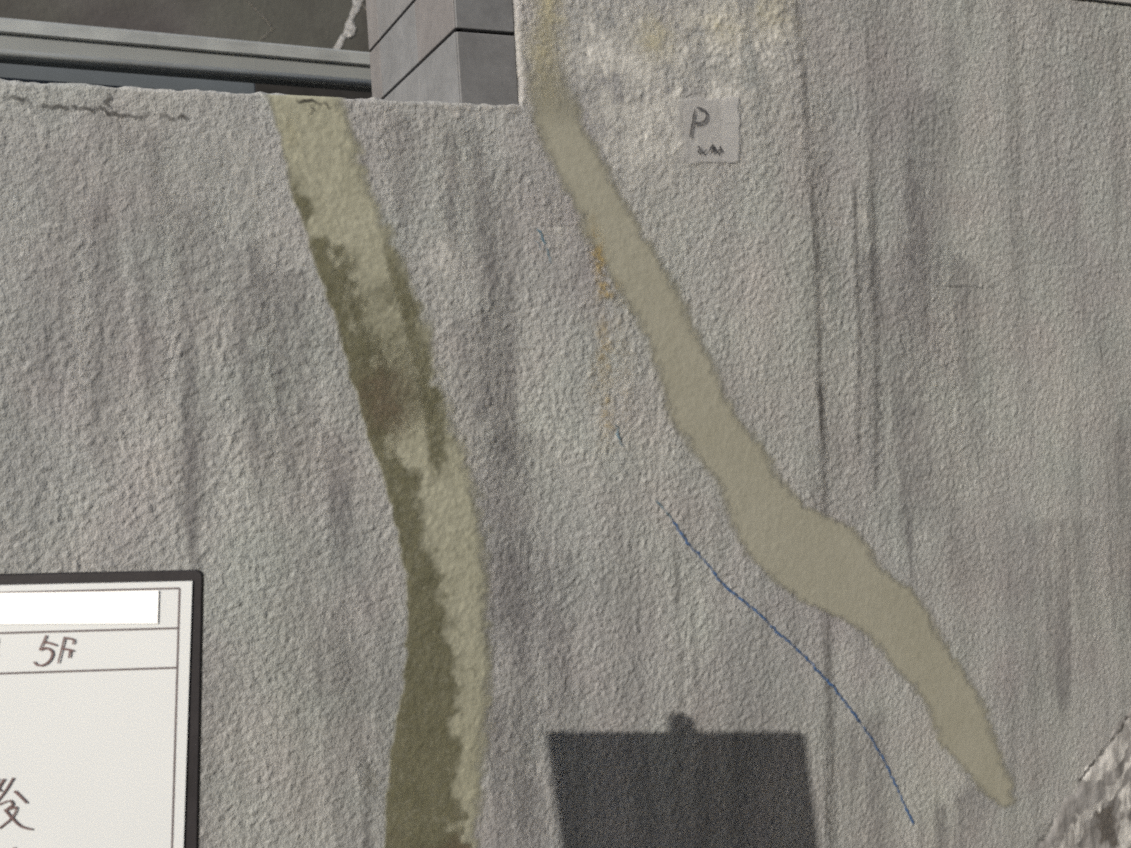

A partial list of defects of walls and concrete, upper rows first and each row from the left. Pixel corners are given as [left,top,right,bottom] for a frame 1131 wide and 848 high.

damp [295,194,312,219]
damp [310,238,467,848]